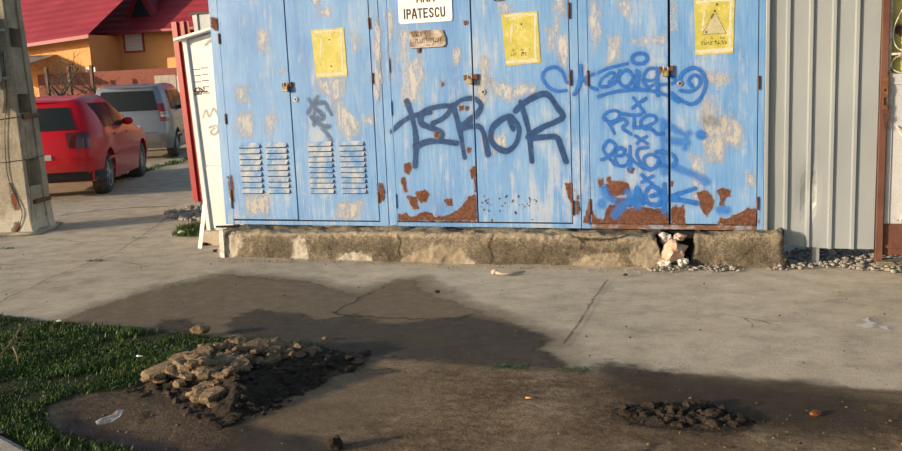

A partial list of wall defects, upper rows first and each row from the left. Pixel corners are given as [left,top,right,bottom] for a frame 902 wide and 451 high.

rust [398,163,537,221]
rust [565,168,685,225]
rust [697,188,730,215]
rust [718,208,759,225]
leakage [61,273,577,370]
crack [564,282,606,343]